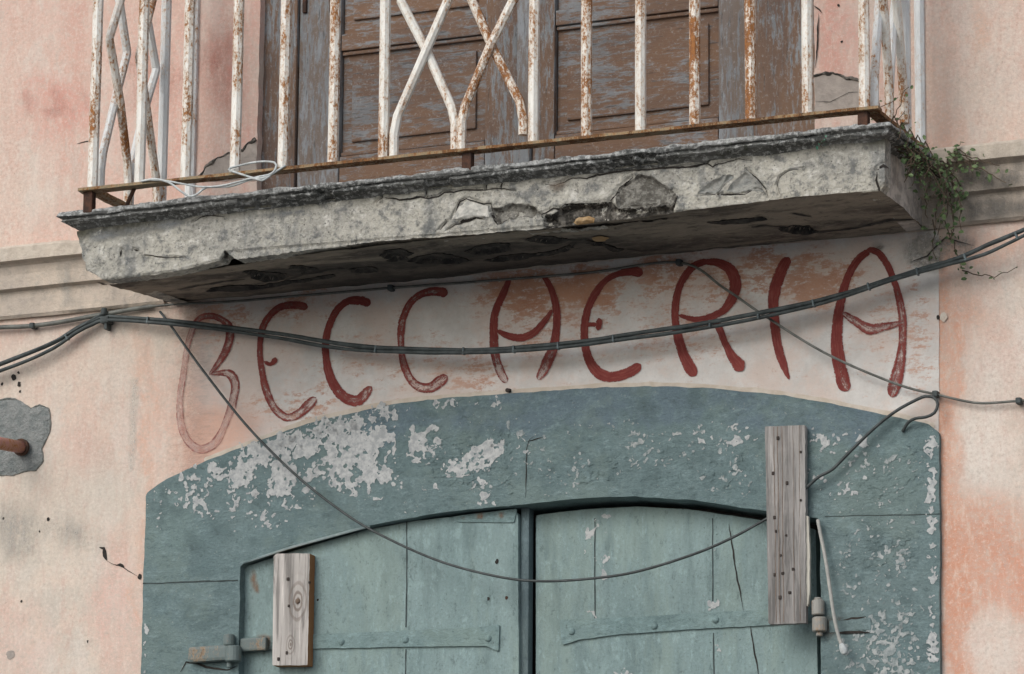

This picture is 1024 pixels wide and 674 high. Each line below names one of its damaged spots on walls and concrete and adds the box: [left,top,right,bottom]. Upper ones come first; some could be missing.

flaking render [813,71,859,111]
flaking render [198,137,257,181]
spalling [698,171,767,194]
spalling [348,174,677,273]
spalling [707,216,768,225]
peeling [0,399,51,476]
peeling [147,395,590,532]
crack [525,436,542,498]
peeling [607,419,758,495]
crack [99,547,137,576]
peeling [807,427,939,674]